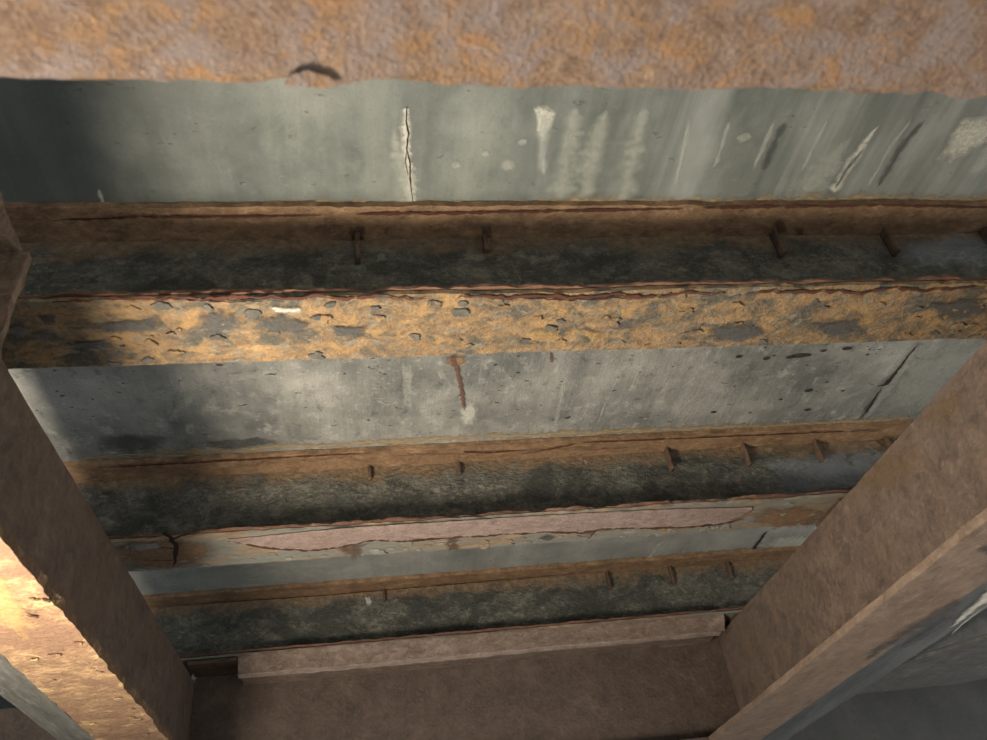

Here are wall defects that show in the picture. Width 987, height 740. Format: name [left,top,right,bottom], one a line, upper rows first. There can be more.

rust [285,70,339,89]
crack [356,107,987,216]
leakage [831,128,877,192]
leakage [879,124,920,185]
leakage [945,118,987,157]
crack [53,214,322,222]
rust [447,356,476,424]
crack [465,344,918,454]
crack [101,453,370,468]
crack [142,532,190,567]